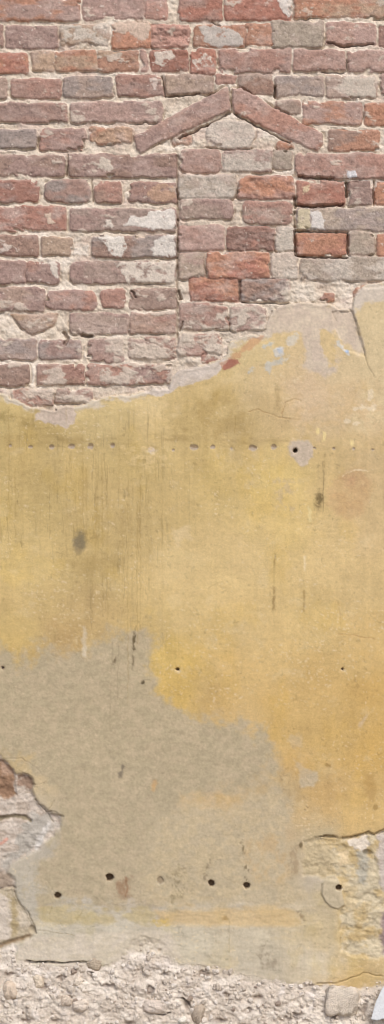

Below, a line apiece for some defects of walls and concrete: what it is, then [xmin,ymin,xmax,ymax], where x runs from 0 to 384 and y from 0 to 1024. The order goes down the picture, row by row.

peeling [34,404,78,431]
leakage [0,373,293,732]
peeling [141,281,384,398]
peeling [0,601,384,1024]